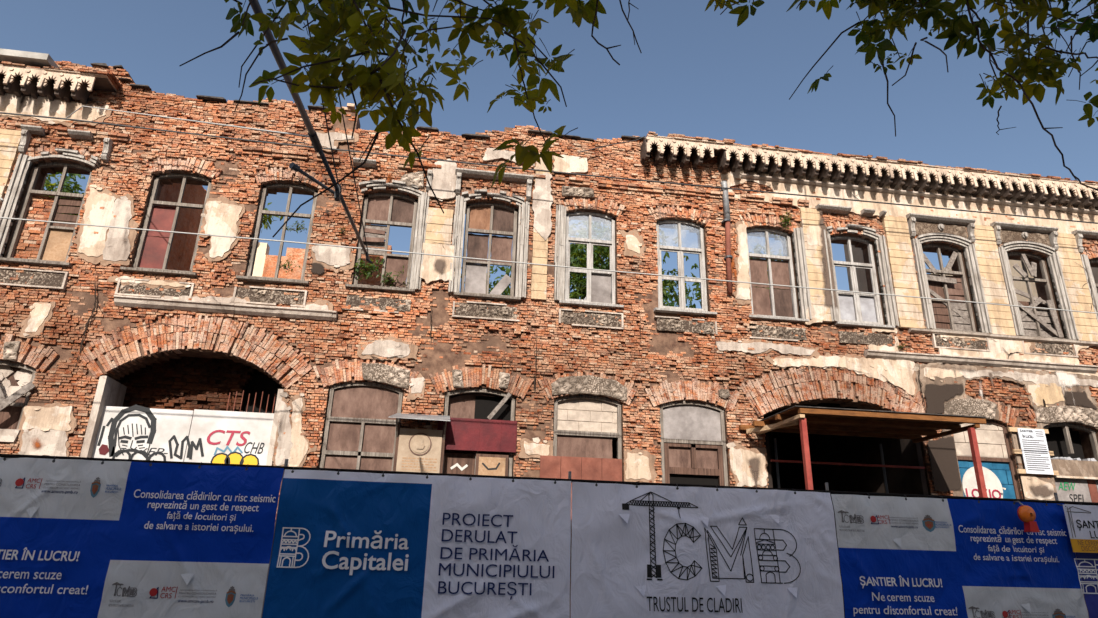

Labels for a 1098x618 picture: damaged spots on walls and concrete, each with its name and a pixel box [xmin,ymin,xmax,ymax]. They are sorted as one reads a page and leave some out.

peeling [0,92,112,127]
peeling [307,130,359,152]
peeling [483,148,517,164]
peeling [428,159,457,201]
peeling [532,153,588,240]
peeling [19,301,56,338]
spalling [293,299,395,319]
peeling [714,220,1098,428]
peeling [357,336,418,362]
peeling [407,373,425,400]
peeling [17,402,78,457]
peeling [272,392,317,467]